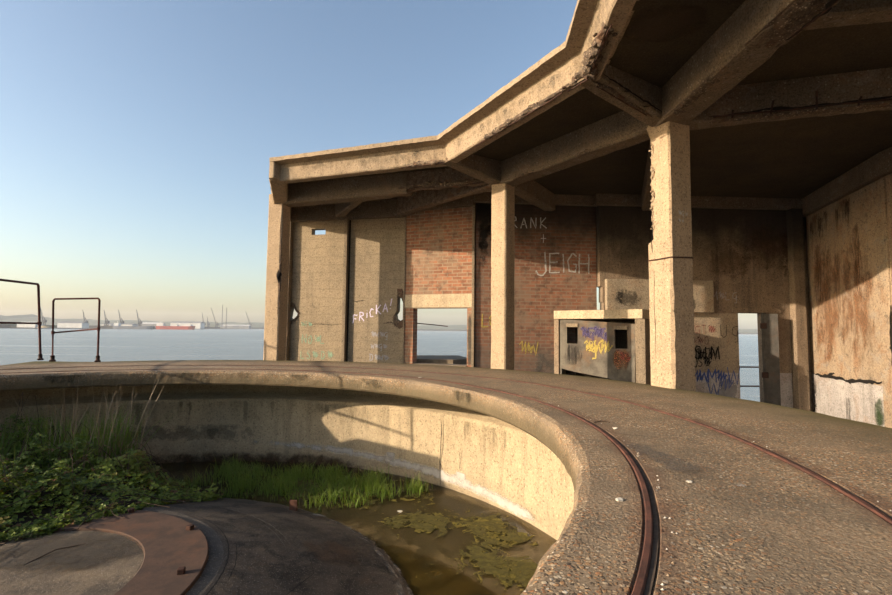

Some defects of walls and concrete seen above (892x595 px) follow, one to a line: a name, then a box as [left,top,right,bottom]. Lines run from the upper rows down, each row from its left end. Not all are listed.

spalling [476,22,652,146]